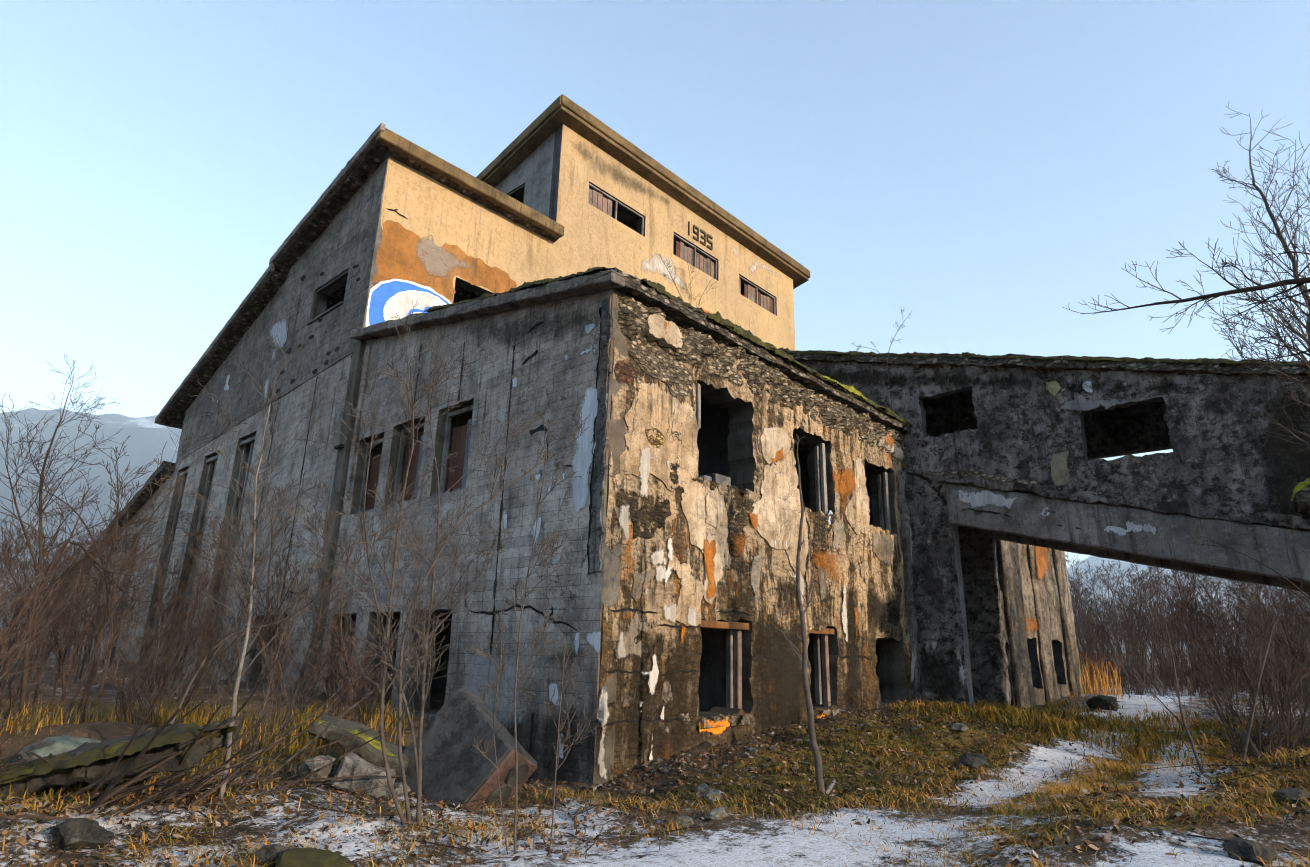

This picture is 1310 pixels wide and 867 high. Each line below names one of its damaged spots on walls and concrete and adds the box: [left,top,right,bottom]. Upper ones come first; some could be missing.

peeling [353,220,517,303]
peeling [594,314,894,660]
peeling [661,680,692,724]